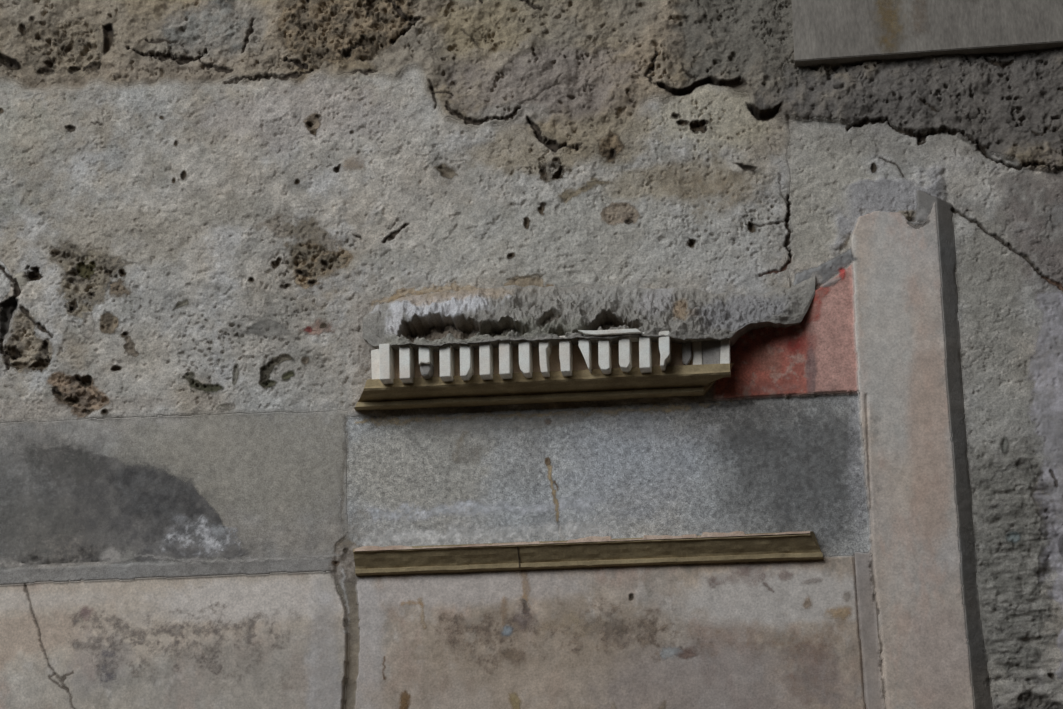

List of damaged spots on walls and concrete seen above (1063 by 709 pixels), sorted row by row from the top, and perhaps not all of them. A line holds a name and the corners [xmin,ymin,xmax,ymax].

crack [429,75,582,152]
crack [847,98,1063,171]
crack [0,265,53,370]
spalling [2,312,109,417]
spalling [49,240,139,357]
spalling [257,214,353,289]
spalling [363,248,856,353]
crack [753,175,792,277]
crack [951,209,1063,291]
water stain [0,449,340,567]
crack [24,585,75,709]